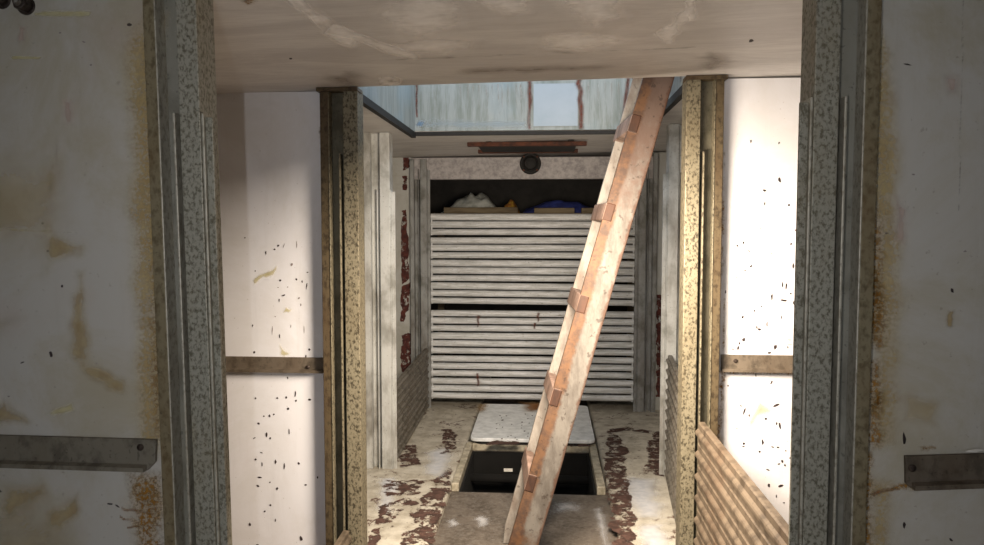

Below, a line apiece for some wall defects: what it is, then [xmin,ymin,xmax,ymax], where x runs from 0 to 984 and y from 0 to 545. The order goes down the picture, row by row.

rust [130,37,160,439]
leakage [73,294,123,390]
rust [866,57,907,545]
rust [120,477,161,545]
peeling [367,415,533,545]
peeling [554,430,647,545]
peeling [645,431,664,477]